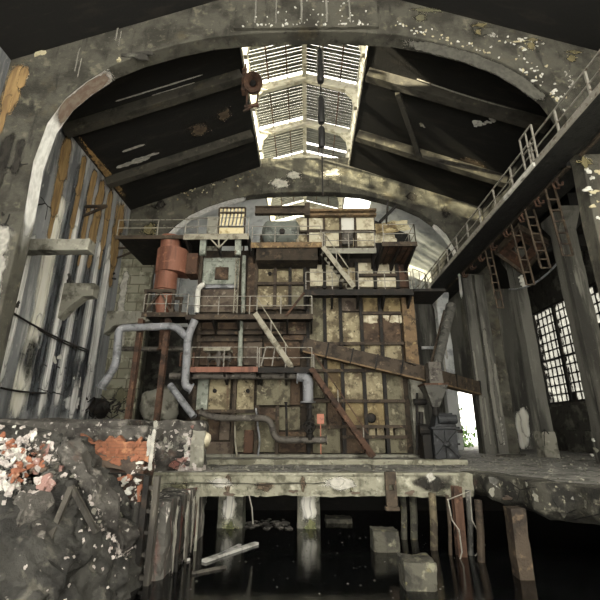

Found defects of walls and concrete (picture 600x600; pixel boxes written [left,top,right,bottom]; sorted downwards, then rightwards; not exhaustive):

peeling [395,21,492,54]
peeling [484,32,548,86]
damp [0,65,29,187]
peeling [582,168,600,208]
damp [10,136,159,419]
spalling [0,425,116,560]
spalling [80,433,235,581]
peeling [155,425,199,471]